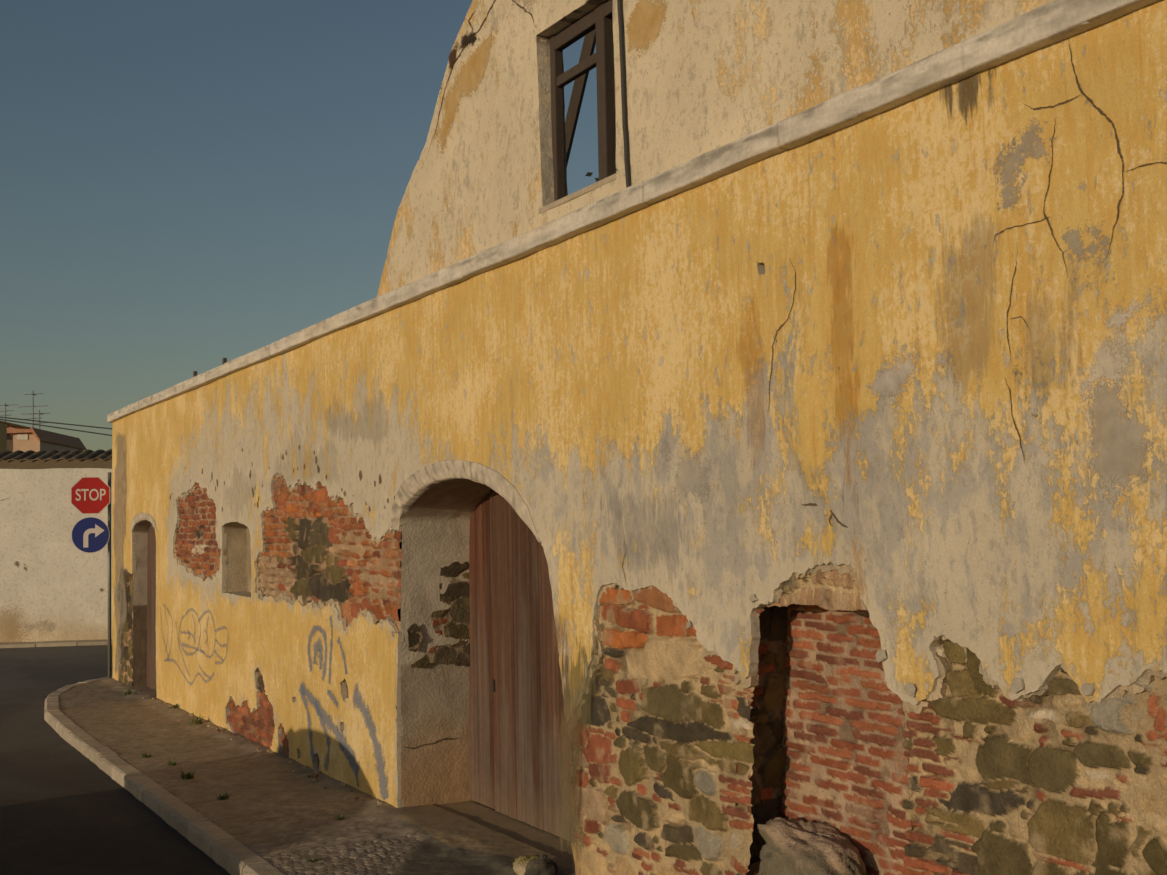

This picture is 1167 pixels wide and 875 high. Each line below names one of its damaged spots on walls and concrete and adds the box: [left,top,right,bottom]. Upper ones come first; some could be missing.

crack [429,0,534,149]
crack [992,37,1167,465]
crack [767,261,796,416]
spalling [118,569,133,687]
spalling [170,469,228,581]
spalling [249,445,470,668]
spalling [749,563,868,617]
spalling [227,670,289,755]
spalling [571,583,759,875]
spalling [902,635,1167,875]